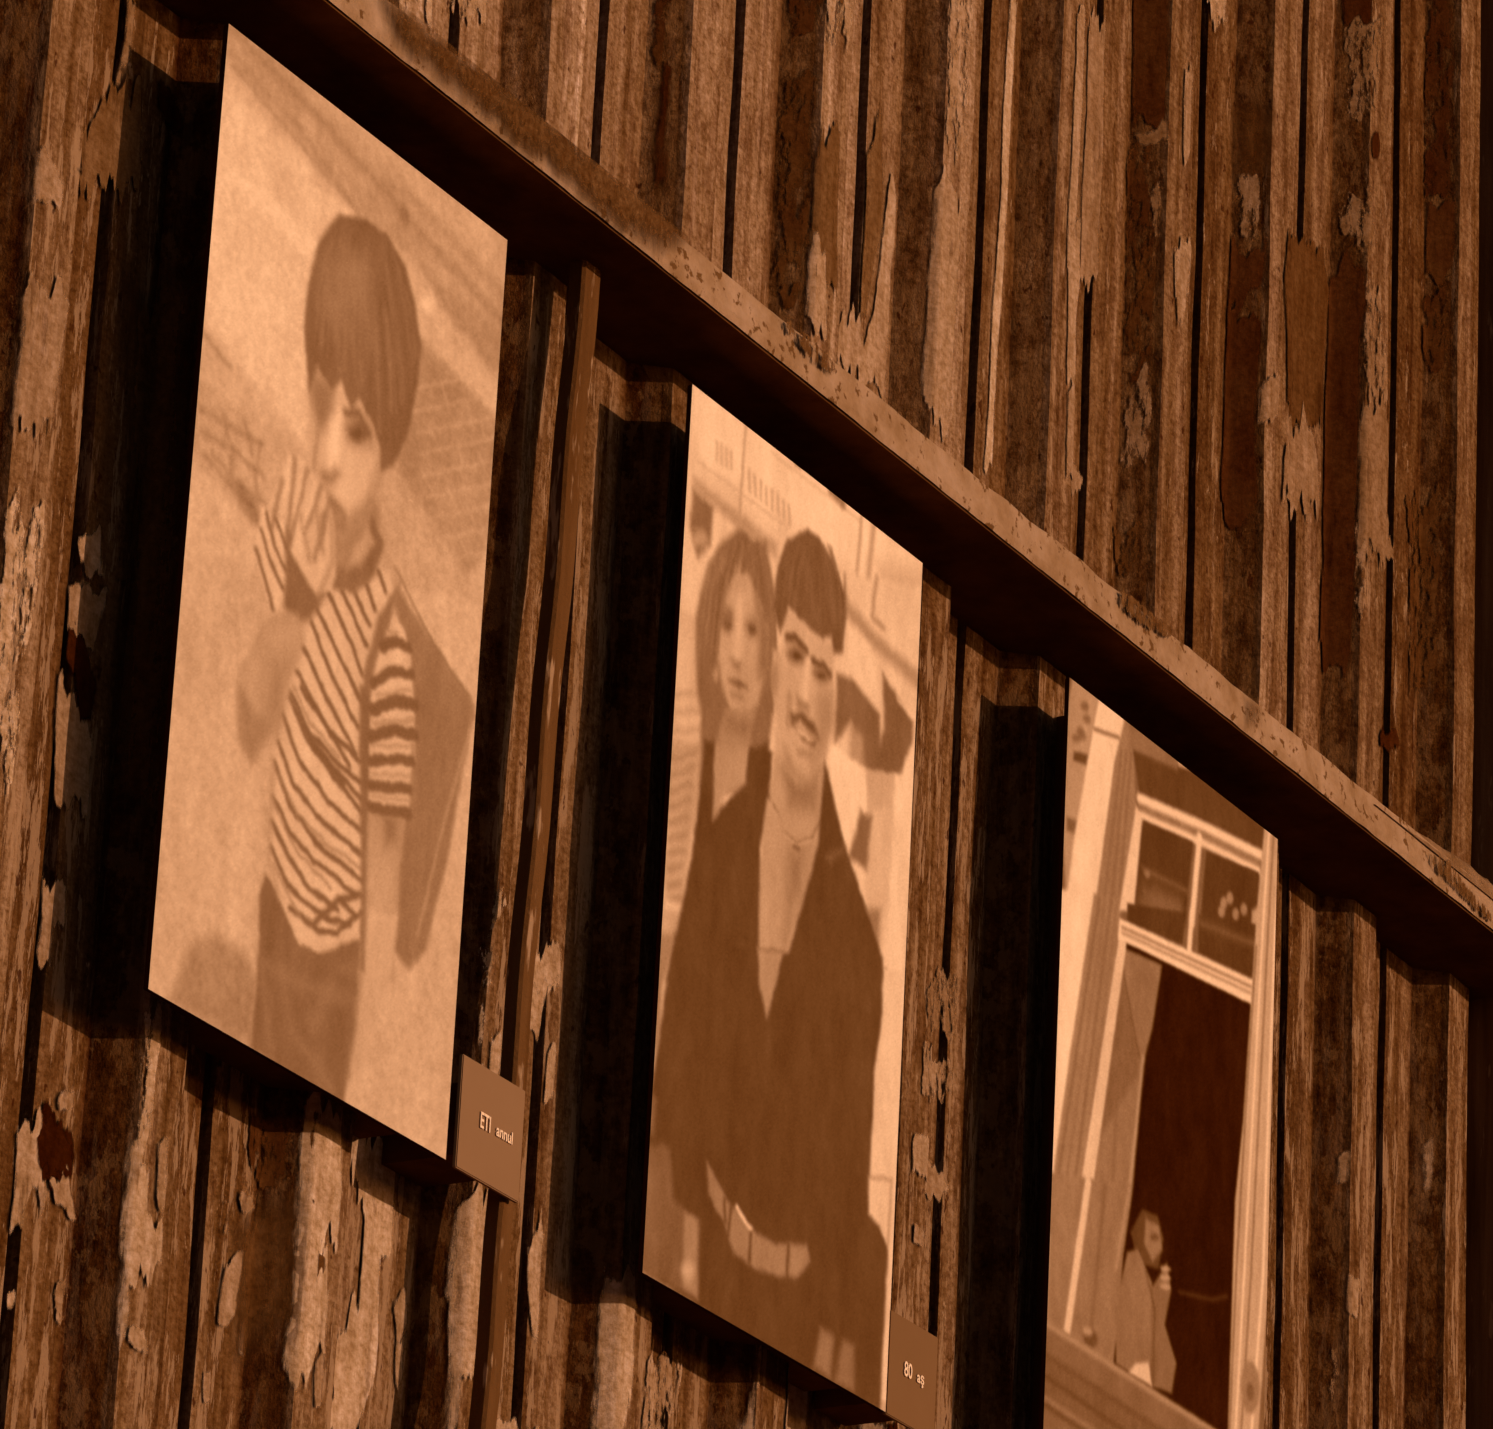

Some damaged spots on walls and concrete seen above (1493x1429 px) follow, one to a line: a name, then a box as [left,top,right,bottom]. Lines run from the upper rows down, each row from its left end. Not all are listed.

peeling [807,110,897,402]
peeling [922,0,974,442]
peeling [1258,371,1320,523]
peeling [1338,184,1396,619]
peeling [38,877,66,969]
peeling [530,939,561,1104]
peeling [10,1090,76,1231]
peeling [117,1000,168,1354]
peeling [218,1250,243,1327]
peeling [284,1092,407,1429]
peeling [447,1183,488,1429]
peeling [528,1209,544,1337]